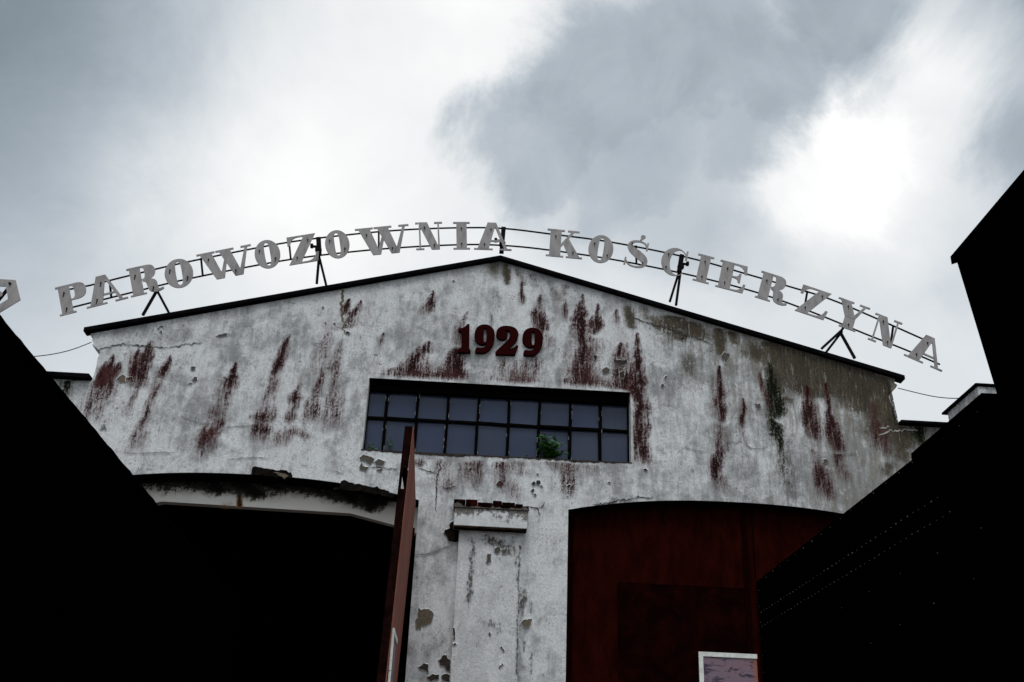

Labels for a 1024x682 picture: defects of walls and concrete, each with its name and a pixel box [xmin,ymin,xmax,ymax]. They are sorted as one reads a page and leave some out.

rust [81,341,172,448]
crack [98,342,201,351]
flaking render [251,466,292,479]
rust [249,299,362,444]
flaking render [333,454,395,498]
rust [384,311,469,380]
rust [562,294,652,464]
rust [710,366,747,488]
water stain [765,363,795,490]
rust [801,382,848,500]
flaking render [415,607,435,630]
flaking render [418,627,458,682]